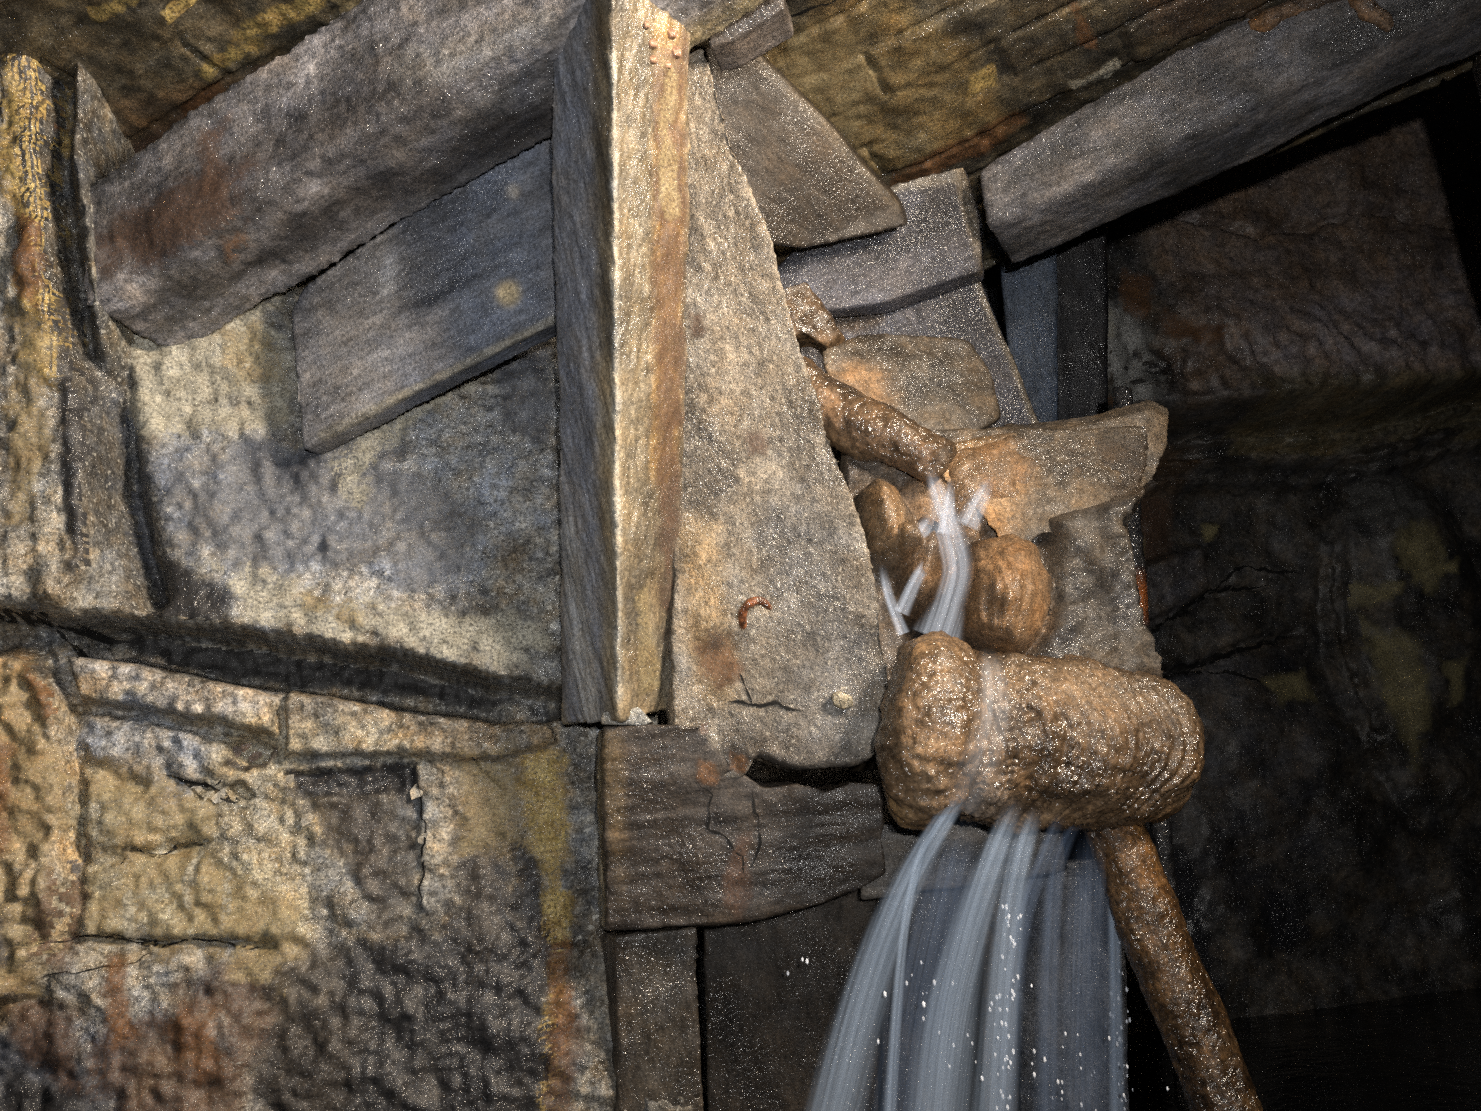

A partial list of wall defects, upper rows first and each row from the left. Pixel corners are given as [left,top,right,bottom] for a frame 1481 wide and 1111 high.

crack [0,72,8,123]
crack [15,933,275,979]
leakage [255,821,575,1111]
corrosion [459,749,575,1111]